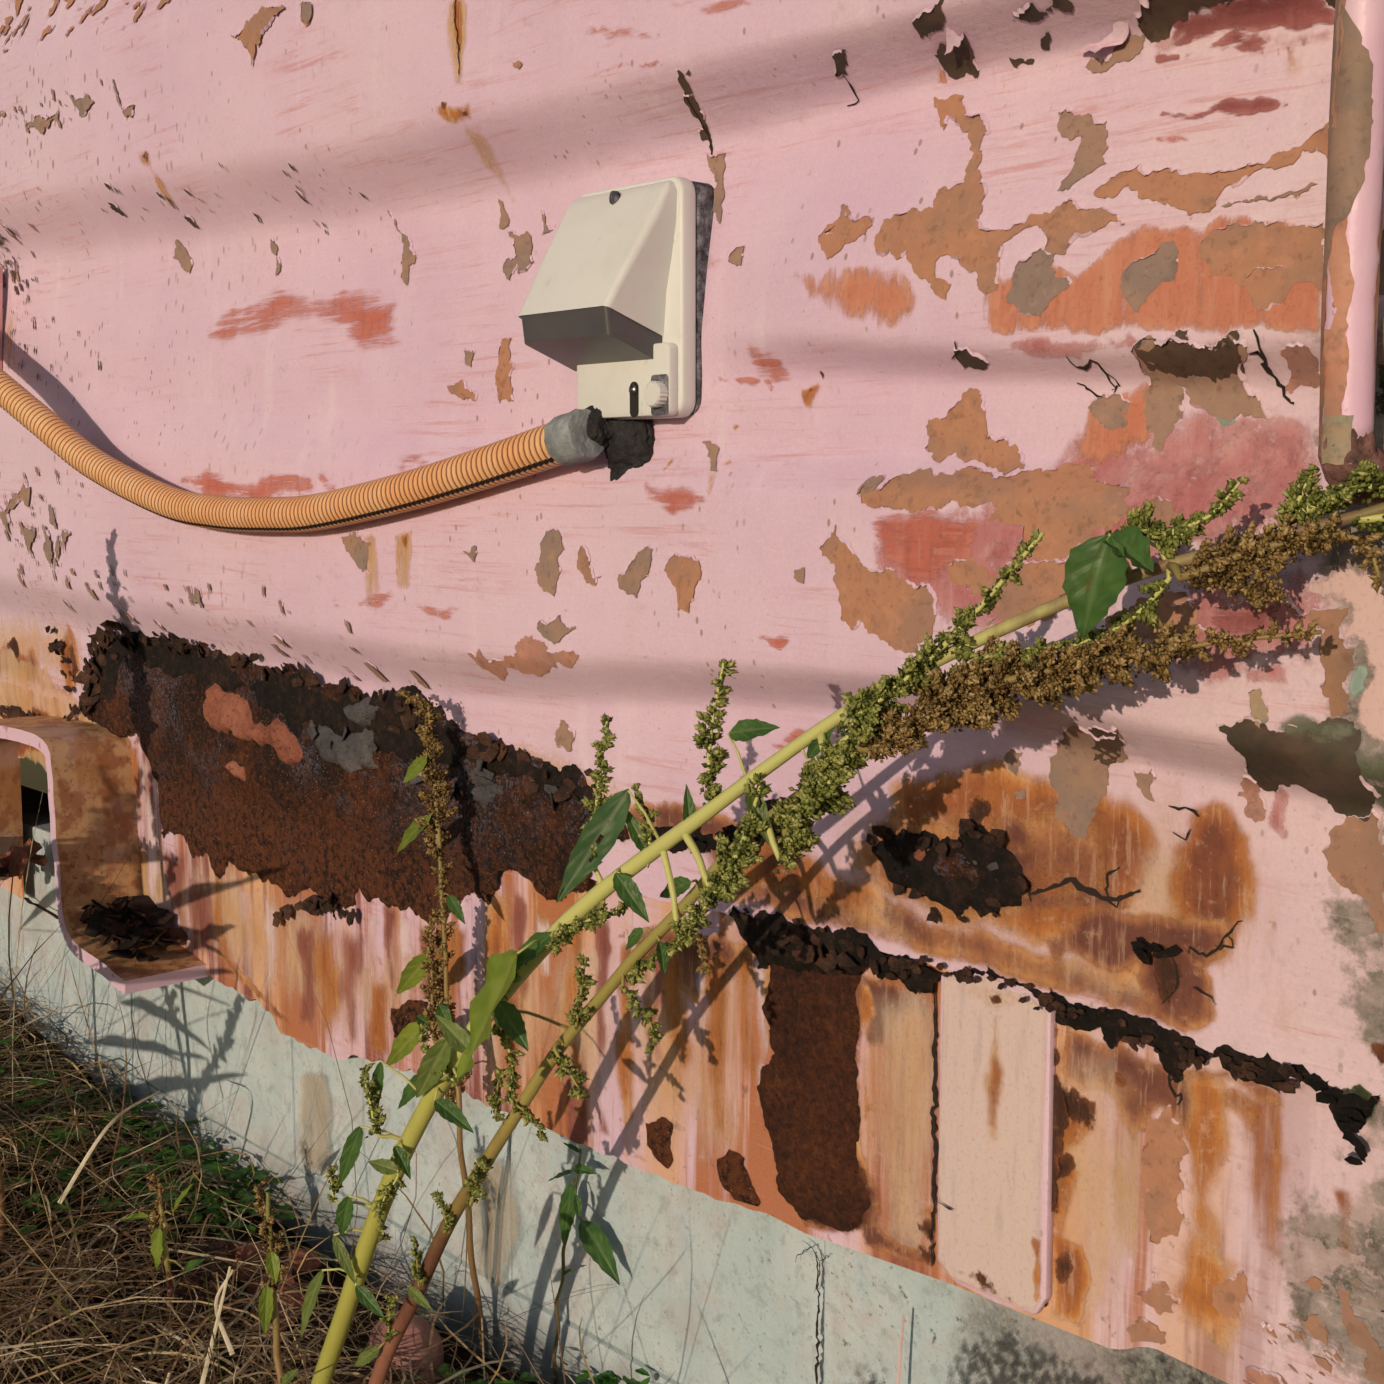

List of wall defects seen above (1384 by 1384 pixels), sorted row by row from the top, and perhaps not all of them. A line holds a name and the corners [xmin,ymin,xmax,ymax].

peeling [39,0,107,40]
peeling [230,0,312,66]
peeling [818,0,1329,316]
peeling [951,342,989,370]
peeling [1066,328,1320,451]
peeling [856,388,1131,627]
peeling [819,524,937,653]
peeling [555,720,575,752]
corrosion [0,620,616,1051]
corrosion [488,980,533,1091]
corrosion [542,760,1381,1349]
peeling [1240,1277,1384,1384]